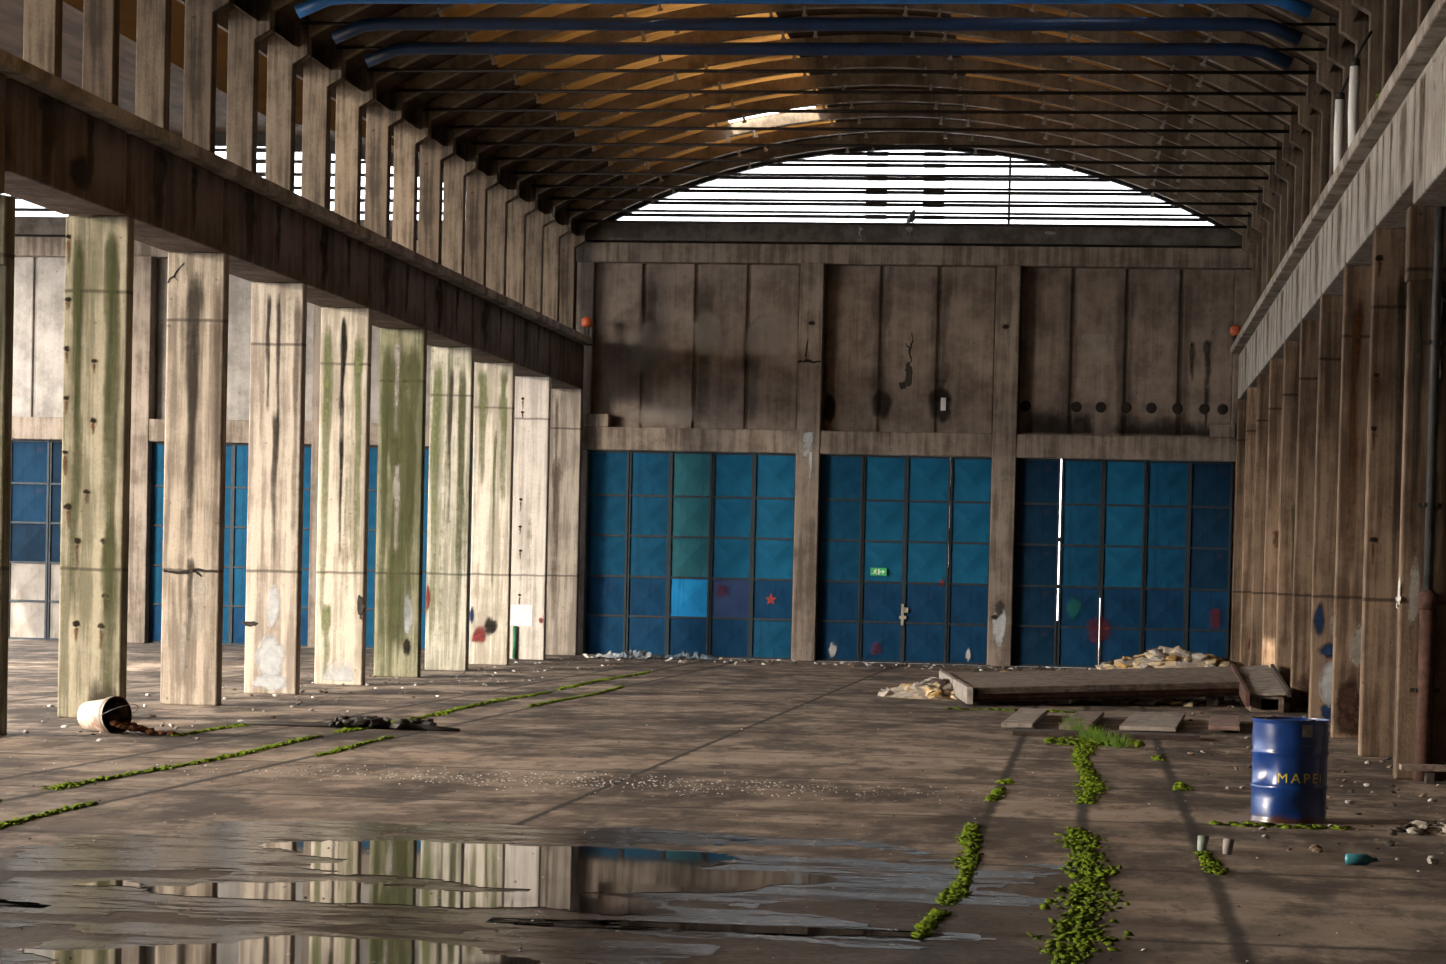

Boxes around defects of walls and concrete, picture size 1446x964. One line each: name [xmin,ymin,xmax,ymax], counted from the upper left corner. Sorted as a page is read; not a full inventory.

water stain [63,489,89,557]
water stain [89,664,113,701]
water stain [98,526,115,648]
water stain [185,279,221,518]
water stain [266,298,301,522]
water stain [339,319,347,539]
water stain [381,346,419,592]
water stain [448,372,466,613]
water stain [493,375,524,520]
water stain [1336,681,1360,735]